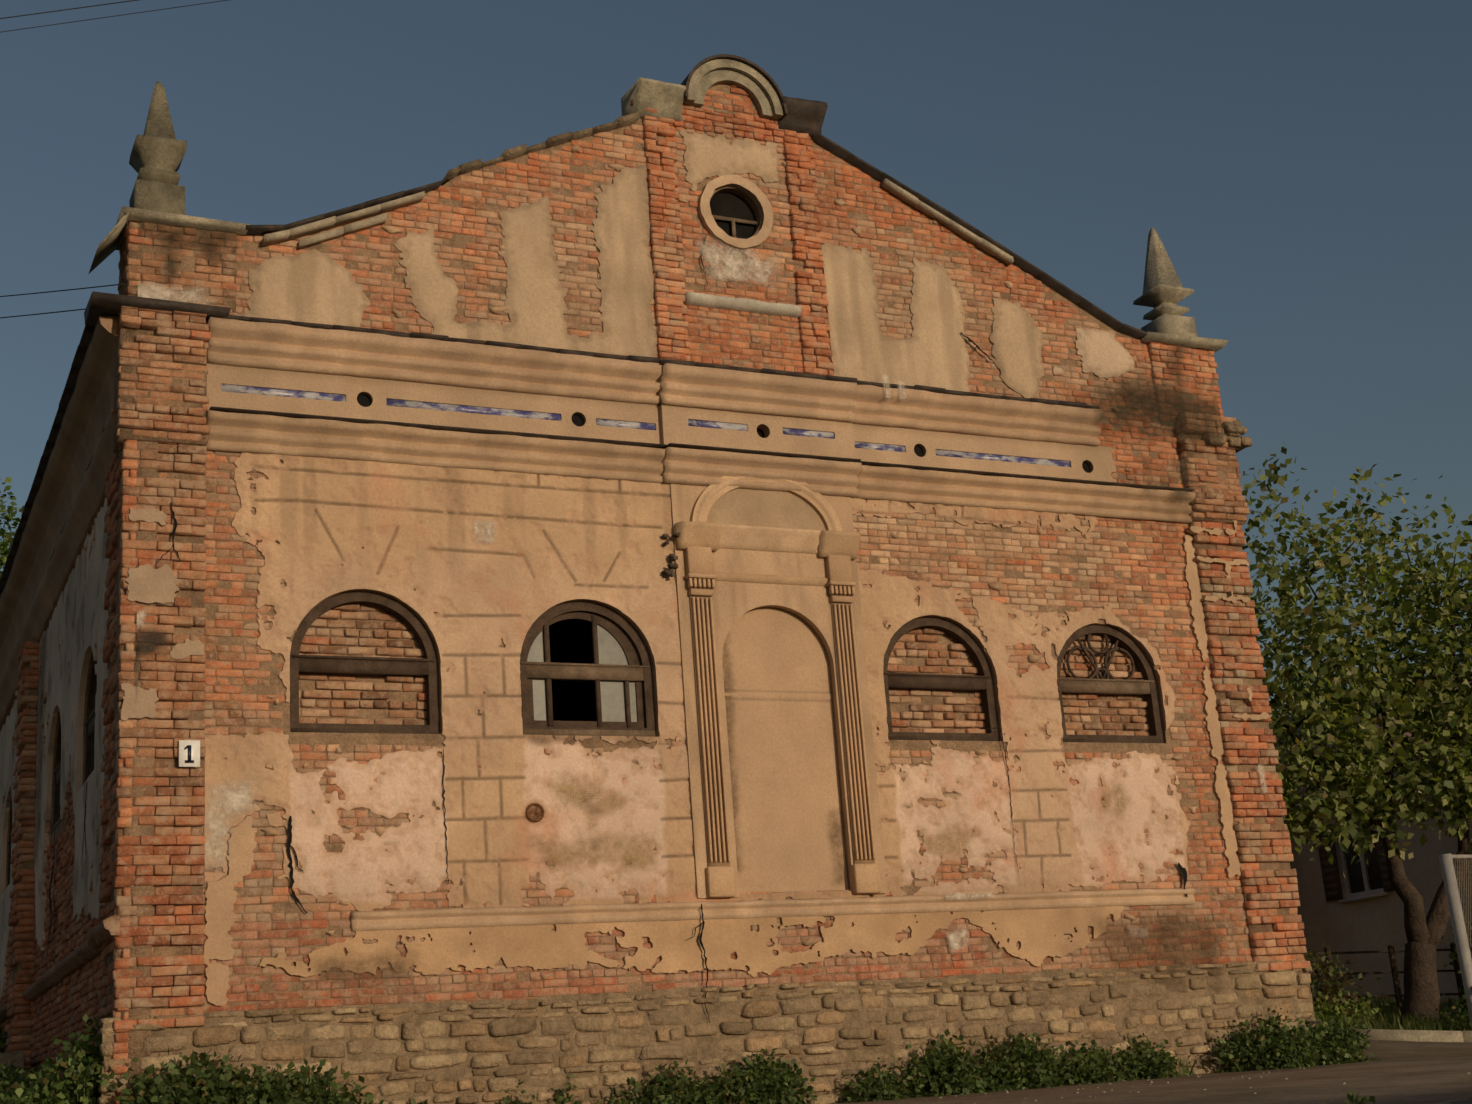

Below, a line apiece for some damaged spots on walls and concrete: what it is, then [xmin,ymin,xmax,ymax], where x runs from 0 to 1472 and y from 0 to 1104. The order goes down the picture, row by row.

spalling [236,114,1161,427]
crack [158,503,181,562]
spalling [202,450,1253,1013]
crack [287,816,307,913]
crack [687,904,710,1022]